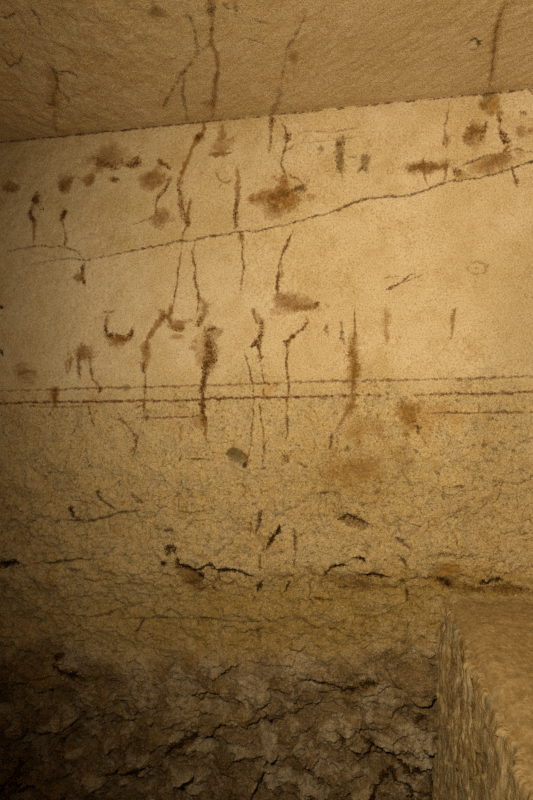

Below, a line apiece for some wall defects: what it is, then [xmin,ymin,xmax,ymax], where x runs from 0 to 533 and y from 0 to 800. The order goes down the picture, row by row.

crack [14,118,533,292]
crack [256,510,297,565]
crack [50,652,87,691]
crack [305,678,380,695]
crack [413,714,438,741]
crack [100,731,247,780]
crack [339,734,433,800]